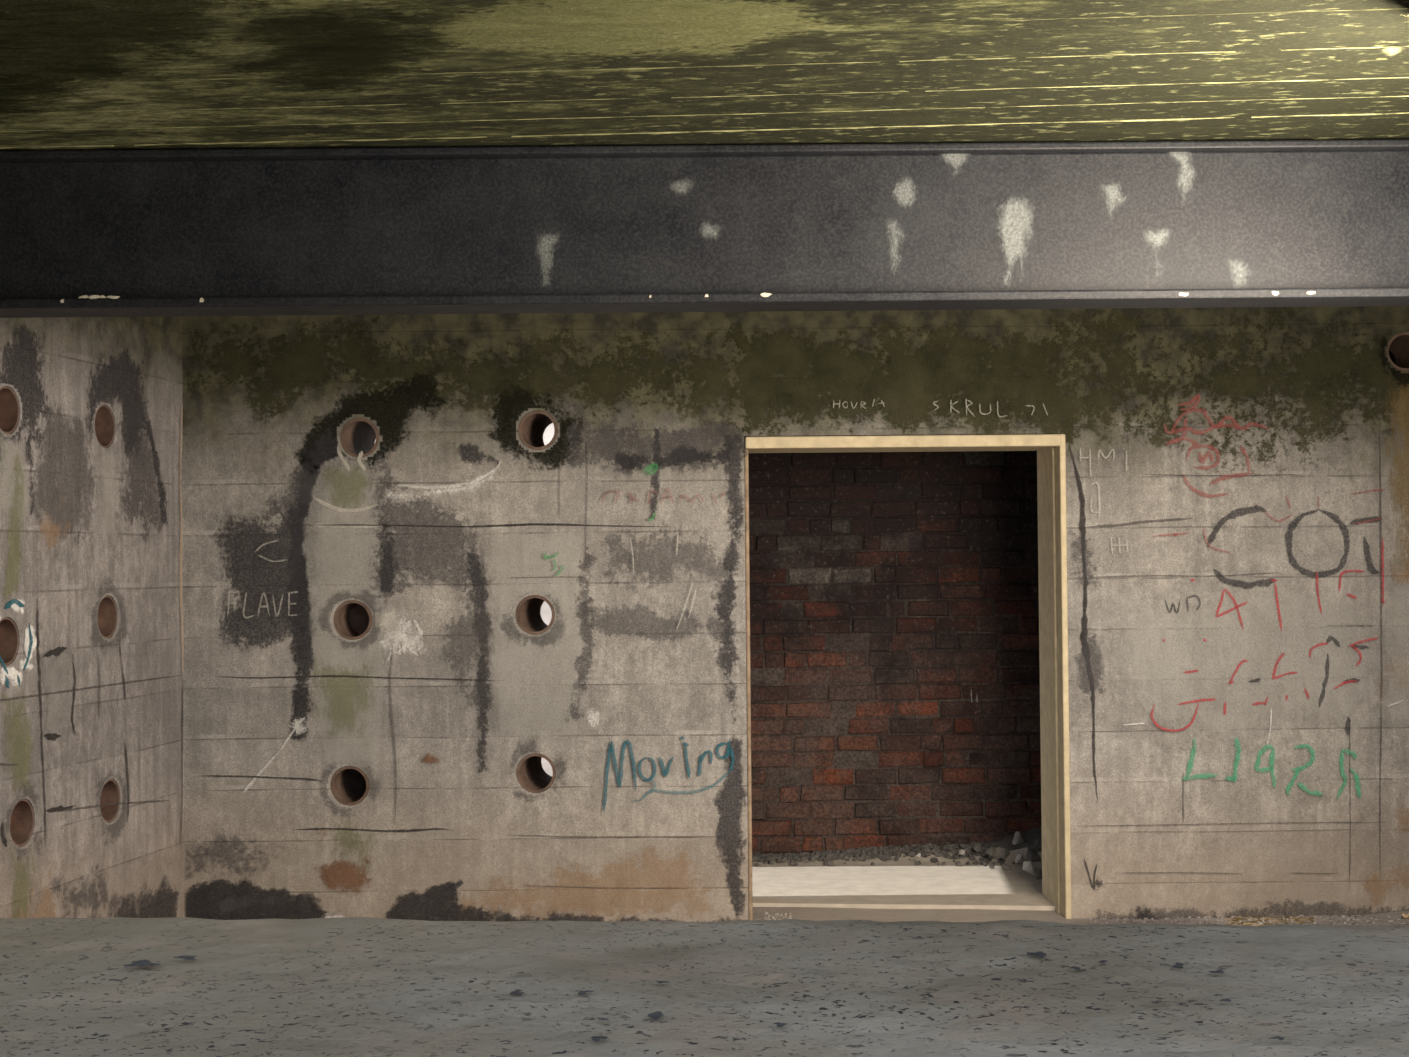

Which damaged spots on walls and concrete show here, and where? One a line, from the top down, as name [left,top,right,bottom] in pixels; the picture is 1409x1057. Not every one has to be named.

water stain [0,0,448,120]
water stain [0,325,184,649]
water stain [214,373,747,922]